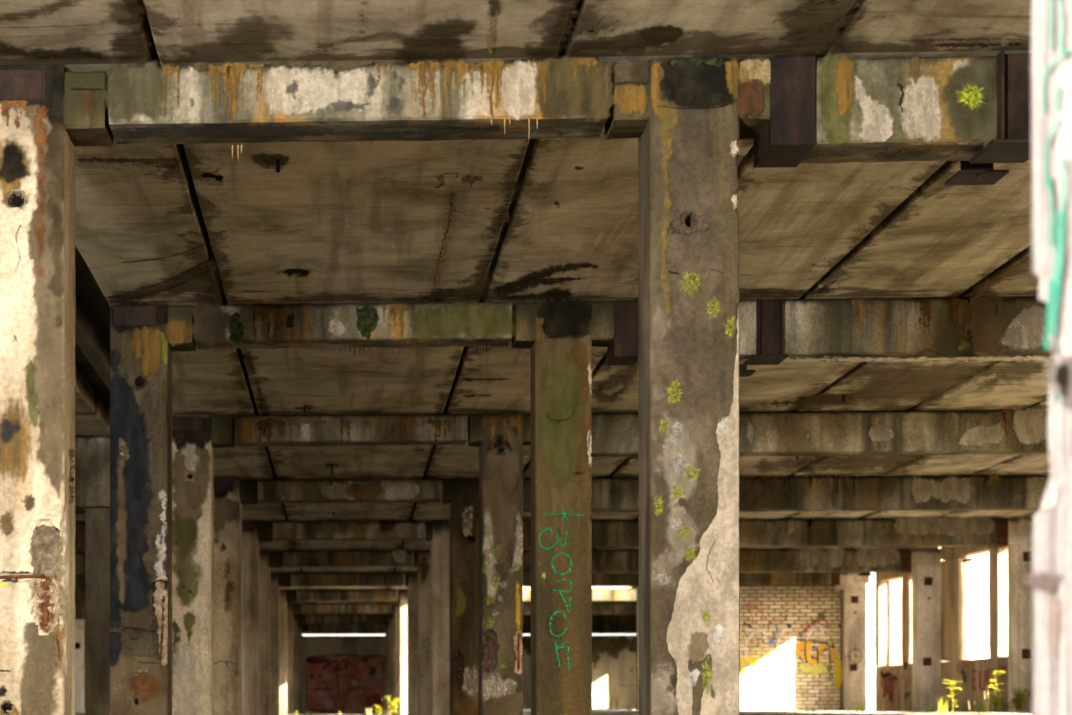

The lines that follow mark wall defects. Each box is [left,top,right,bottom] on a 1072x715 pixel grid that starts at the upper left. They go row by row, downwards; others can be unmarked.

rust [409,60,505,117]
damp [509,0,863,122]
peeling [854,76,941,142]
damp [0,0,507,495]
spalling [0,524,61,661]
damp [116,454,128,603]
peeling [666,319,771,715]
damp [110,621,190,715]